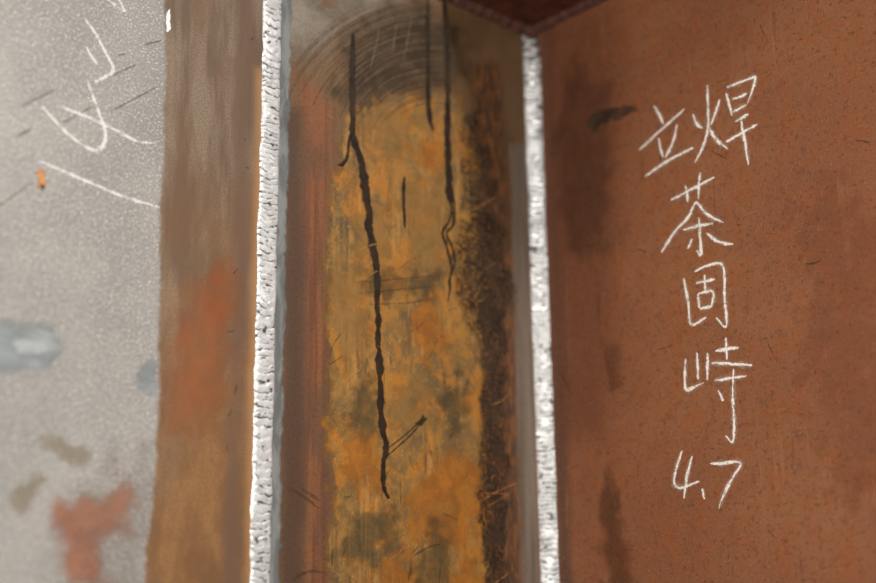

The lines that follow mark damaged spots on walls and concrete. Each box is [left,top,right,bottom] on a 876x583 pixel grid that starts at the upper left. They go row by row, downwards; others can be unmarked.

rust [55,490,132,580]
rust [321,79,492,583]